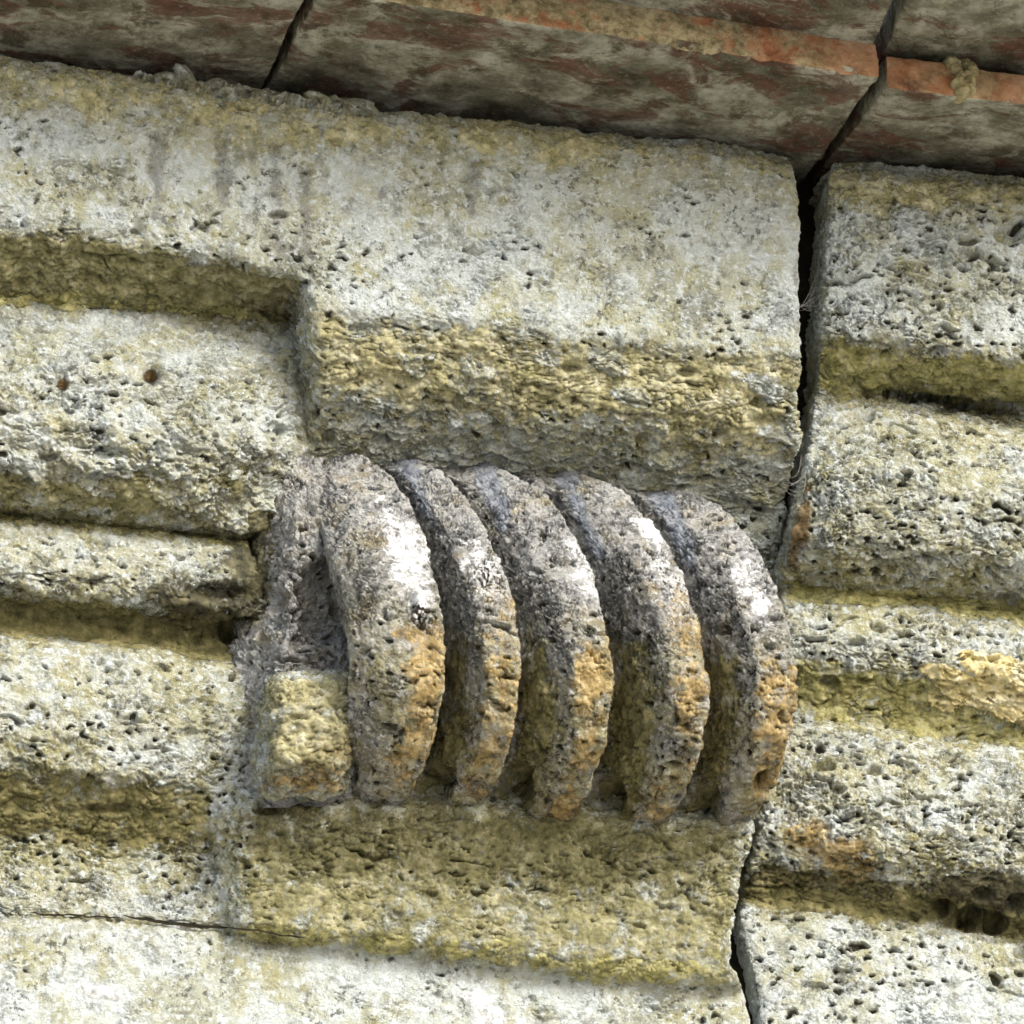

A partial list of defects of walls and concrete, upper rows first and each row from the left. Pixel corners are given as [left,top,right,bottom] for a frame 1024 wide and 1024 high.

crack [31,912,305,938]
crack [729,907,753,1024]